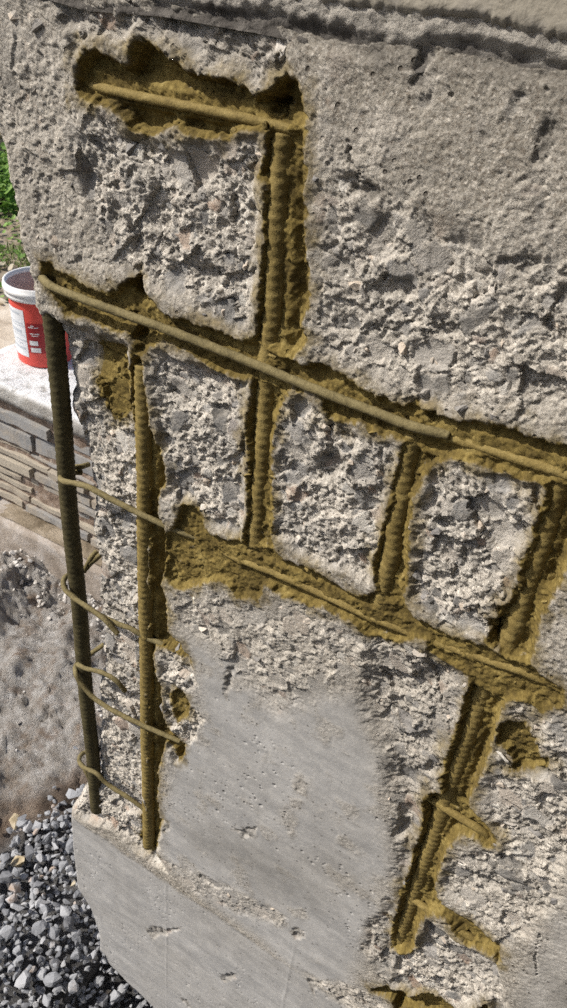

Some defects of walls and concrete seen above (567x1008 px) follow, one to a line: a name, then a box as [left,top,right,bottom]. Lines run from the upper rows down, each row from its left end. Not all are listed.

spalling [0,0,294,335]
spalling [409,43,448,111]
spalling [304,129,567,443]
spalling [530,109,565,170]
spalling [55,318,306,941]
spalling [272,395,403,585]
spalling [407,461,546,642]
spalling [159,589,510,1008]
spalling [438,701,567,952]